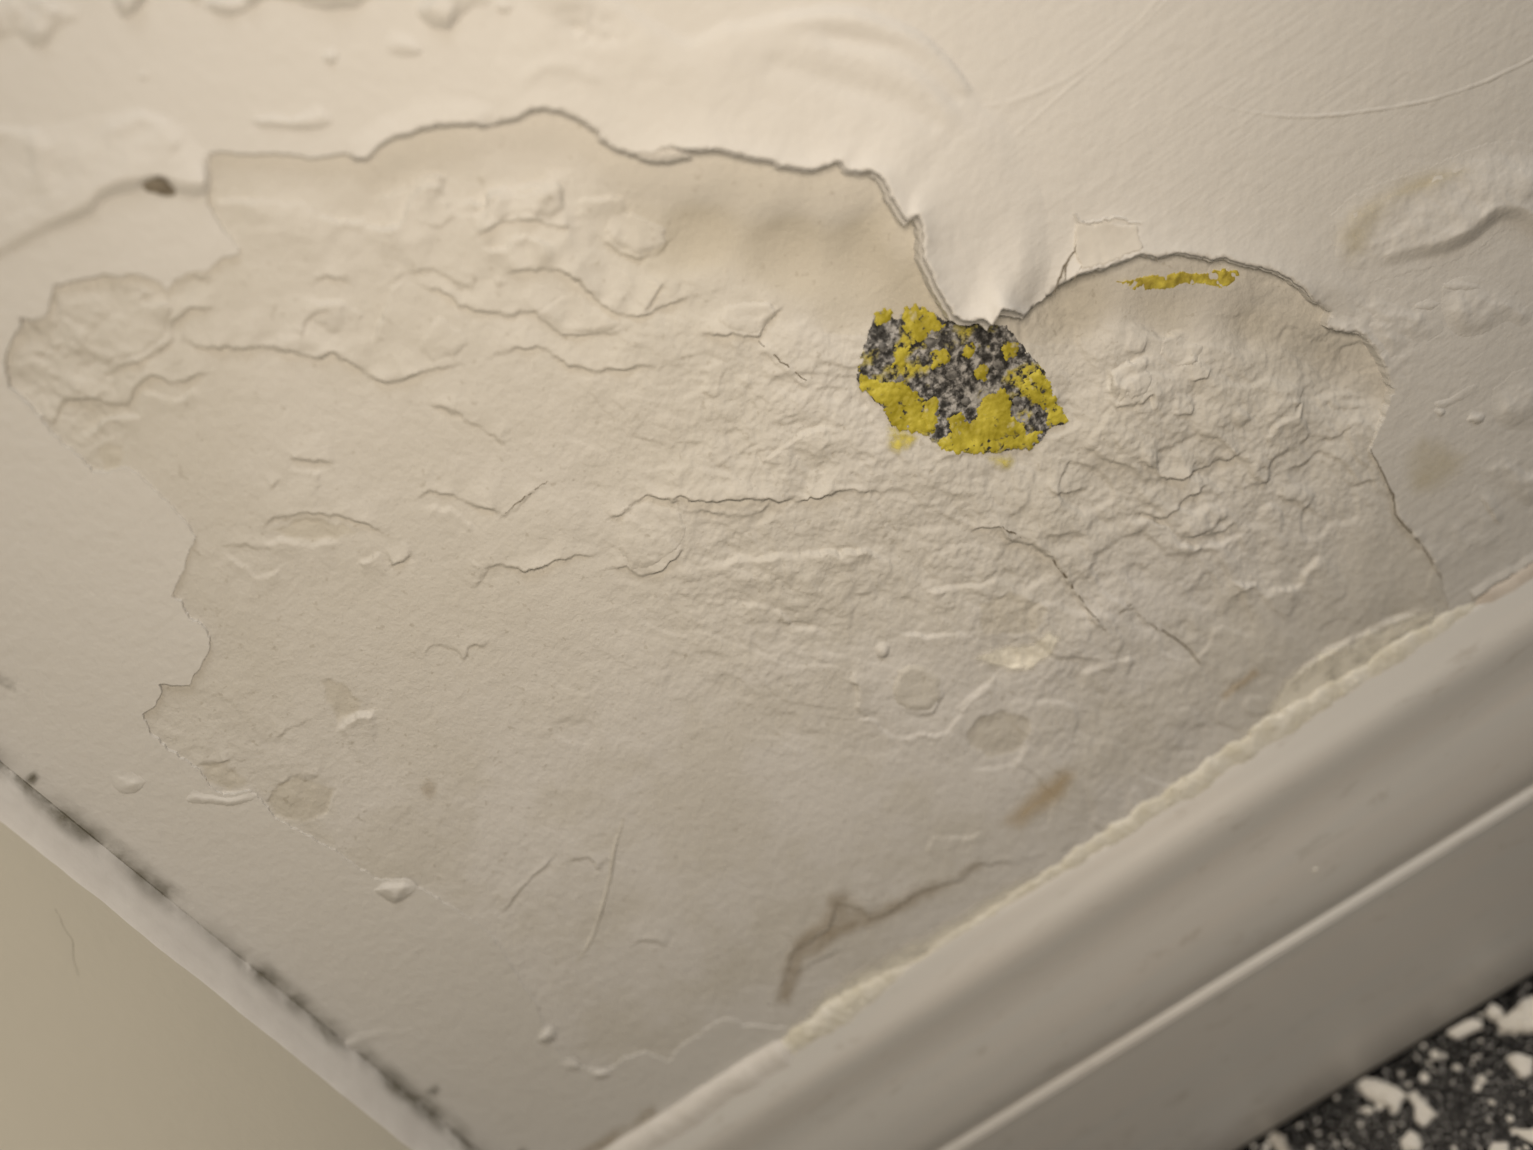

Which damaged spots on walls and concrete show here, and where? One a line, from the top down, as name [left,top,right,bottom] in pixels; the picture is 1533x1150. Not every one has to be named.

peeling [345,92,494,160]
peeling [486,0,1053,326]
peeling [1395,499,1512,578]
flaking render [0,107,1448,1069]
peeling [1470,551,1533,606]
flaking render [1485,996,1533,1034]
flaking render [1506,1053,1533,1079]